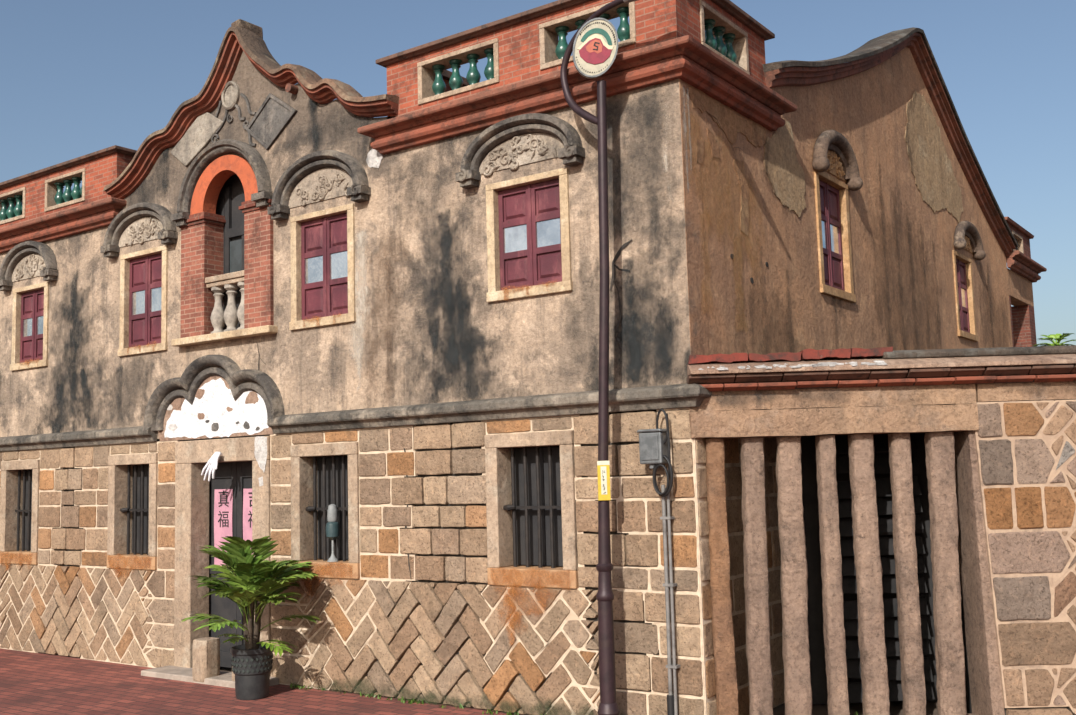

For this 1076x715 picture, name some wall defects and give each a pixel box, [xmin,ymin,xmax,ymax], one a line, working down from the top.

spalling [686,87,806,217]
spalling [905,91,963,223]
leakage [38,274,97,434]
leakage [429,212,493,398]
leakage [609,260,674,385]
peeling [164,378,269,486]